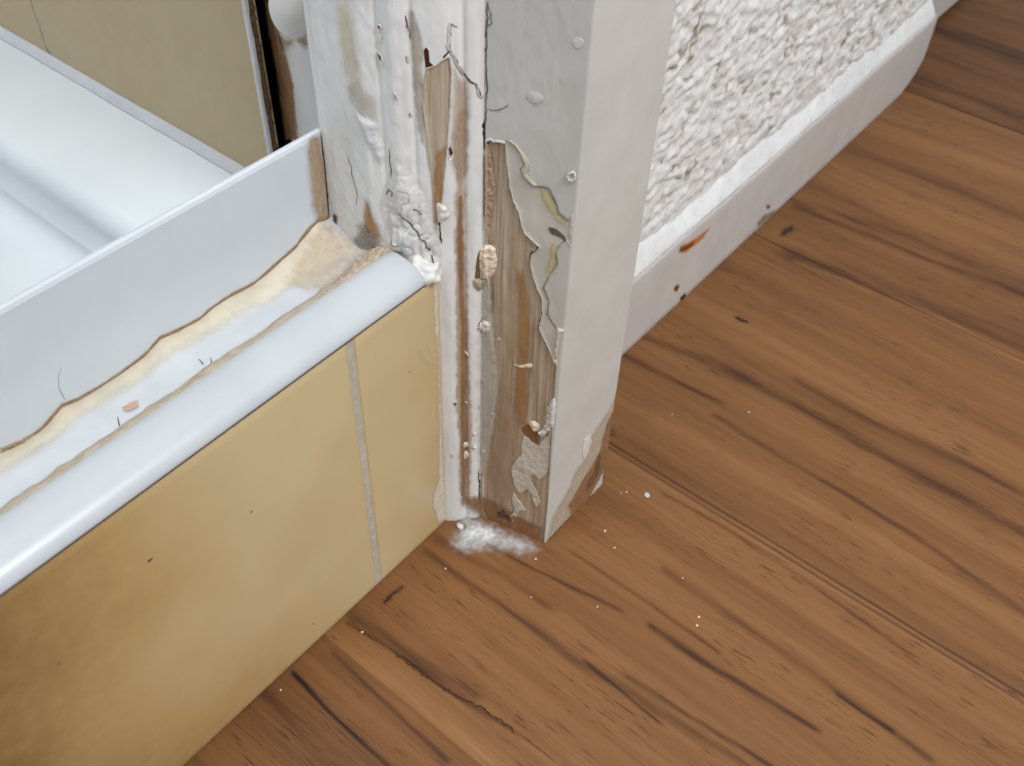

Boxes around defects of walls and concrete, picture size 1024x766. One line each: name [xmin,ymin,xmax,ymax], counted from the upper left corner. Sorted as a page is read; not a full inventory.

damp [0,135,379,470]
peeling [405,14,468,226]
crack [443,2,509,223]
peeling [451,138,574,542]
damp [455,114,615,541]
rust [680,229,709,252]